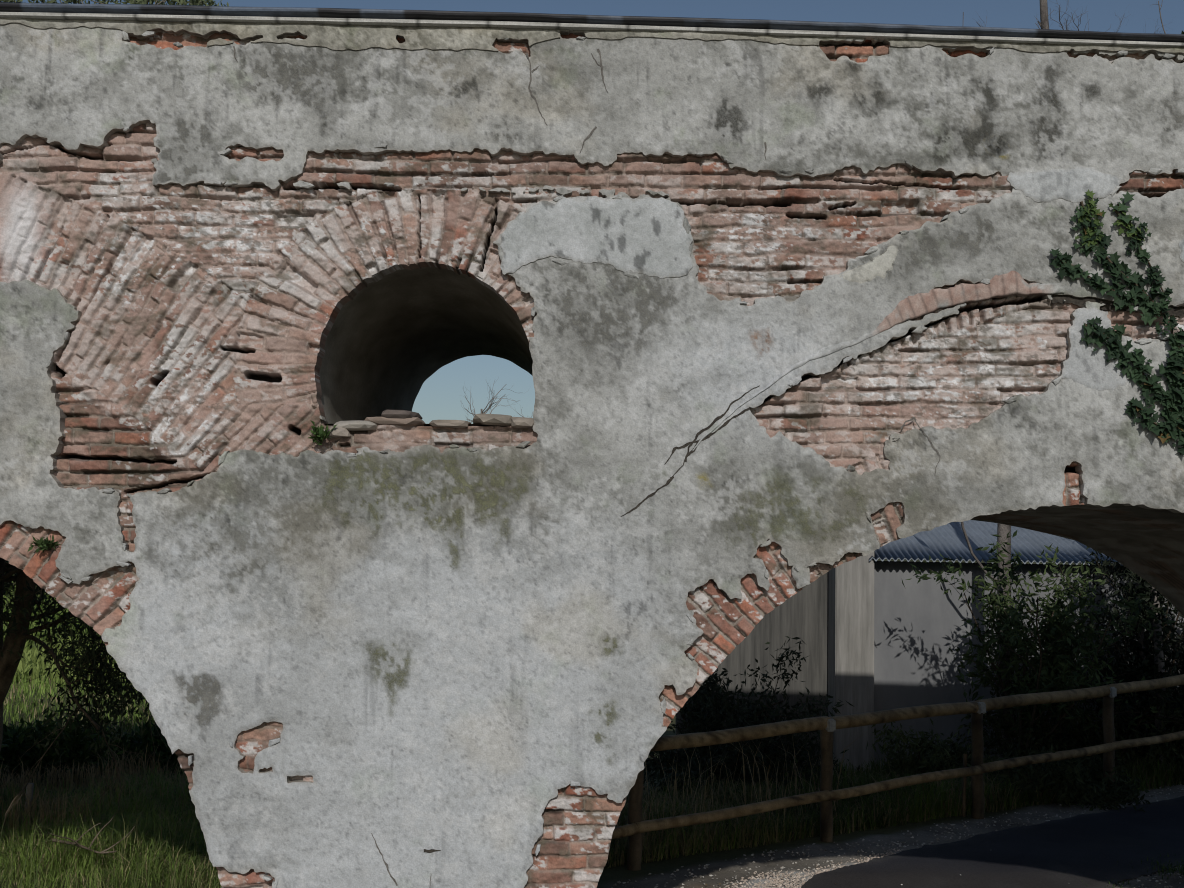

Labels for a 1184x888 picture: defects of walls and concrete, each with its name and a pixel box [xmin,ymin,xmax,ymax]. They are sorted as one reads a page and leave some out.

flaking render [122,31,250,50]
flaking render [819,38,889,63]
flaking render [1110,168,1184,198]
flaking render [1100,306,1184,347]
flaking render [0,122,1012,645]
flaking render [749,281,1083,475]
crack [622,385,760,516]
crack [901,417,941,474]
flaking render [659,539,861,727]
flaking render [230,721,283,771]
flaking render [524,780,627,888]
flaking render [216,867,278,888]